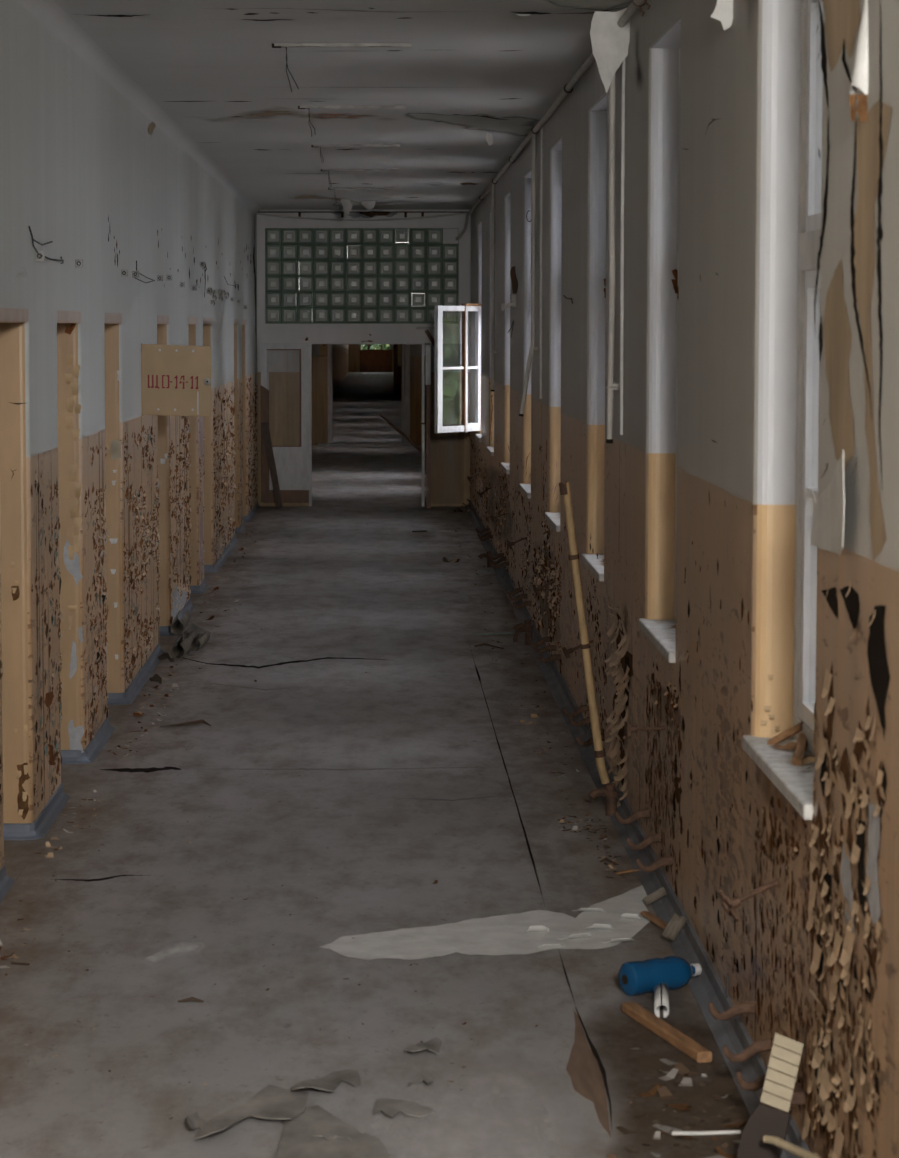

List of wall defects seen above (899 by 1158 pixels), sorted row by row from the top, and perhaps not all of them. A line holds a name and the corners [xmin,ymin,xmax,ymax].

flaking render [408,113,536,135]
flaking render [547,0,632,11]
peeling [11,377,259,820]
peeling [510,439,730,896]
peeling [706,581,890,1158]